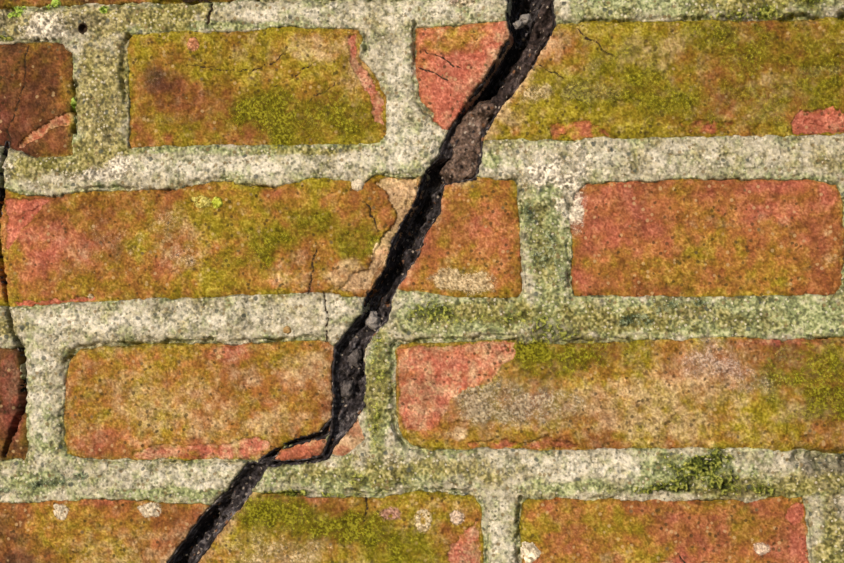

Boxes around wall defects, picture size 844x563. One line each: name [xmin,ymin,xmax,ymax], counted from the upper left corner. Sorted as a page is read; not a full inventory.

crack [577,28,612,55]
crack [0,45,31,218]
crack [167,0,563,563]
crack [16,379,28,419]